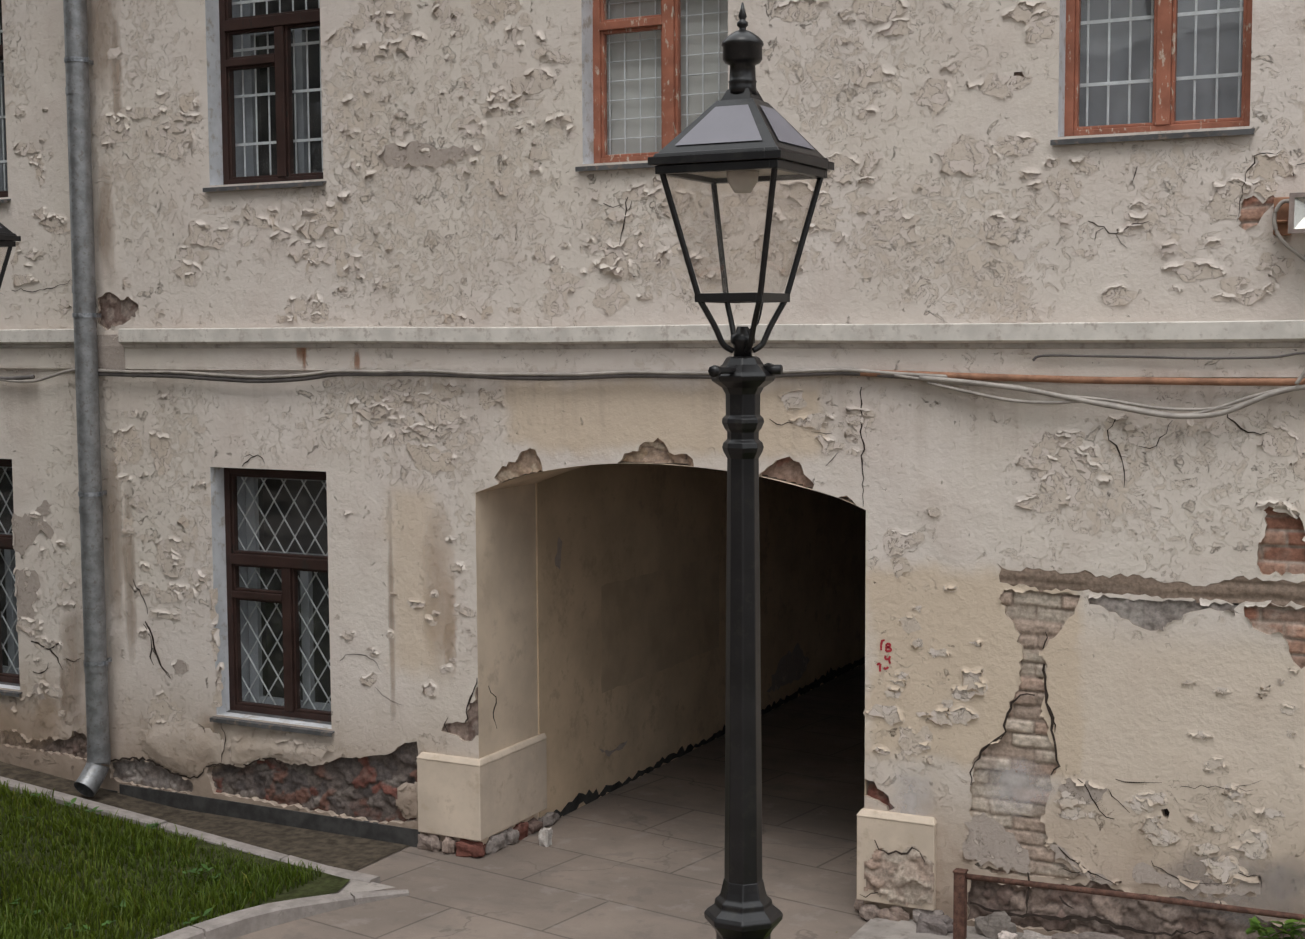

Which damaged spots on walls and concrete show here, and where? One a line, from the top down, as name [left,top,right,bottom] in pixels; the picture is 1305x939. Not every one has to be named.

peeling [172,0,579,324]
peeling [530,173,722,318]
peeling [1114,149,1300,309]
spalling [96,276,166,330]
spalling [497,449,543,482]
spalling [623,438,694,466]
spalling [762,457,814,489]
crack [770,387,865,503]
flaking render [1254,496,1305,579]
crack [129,580,170,678]
spalling [212,737,418,823]
flaking render [967,585,1305,939]